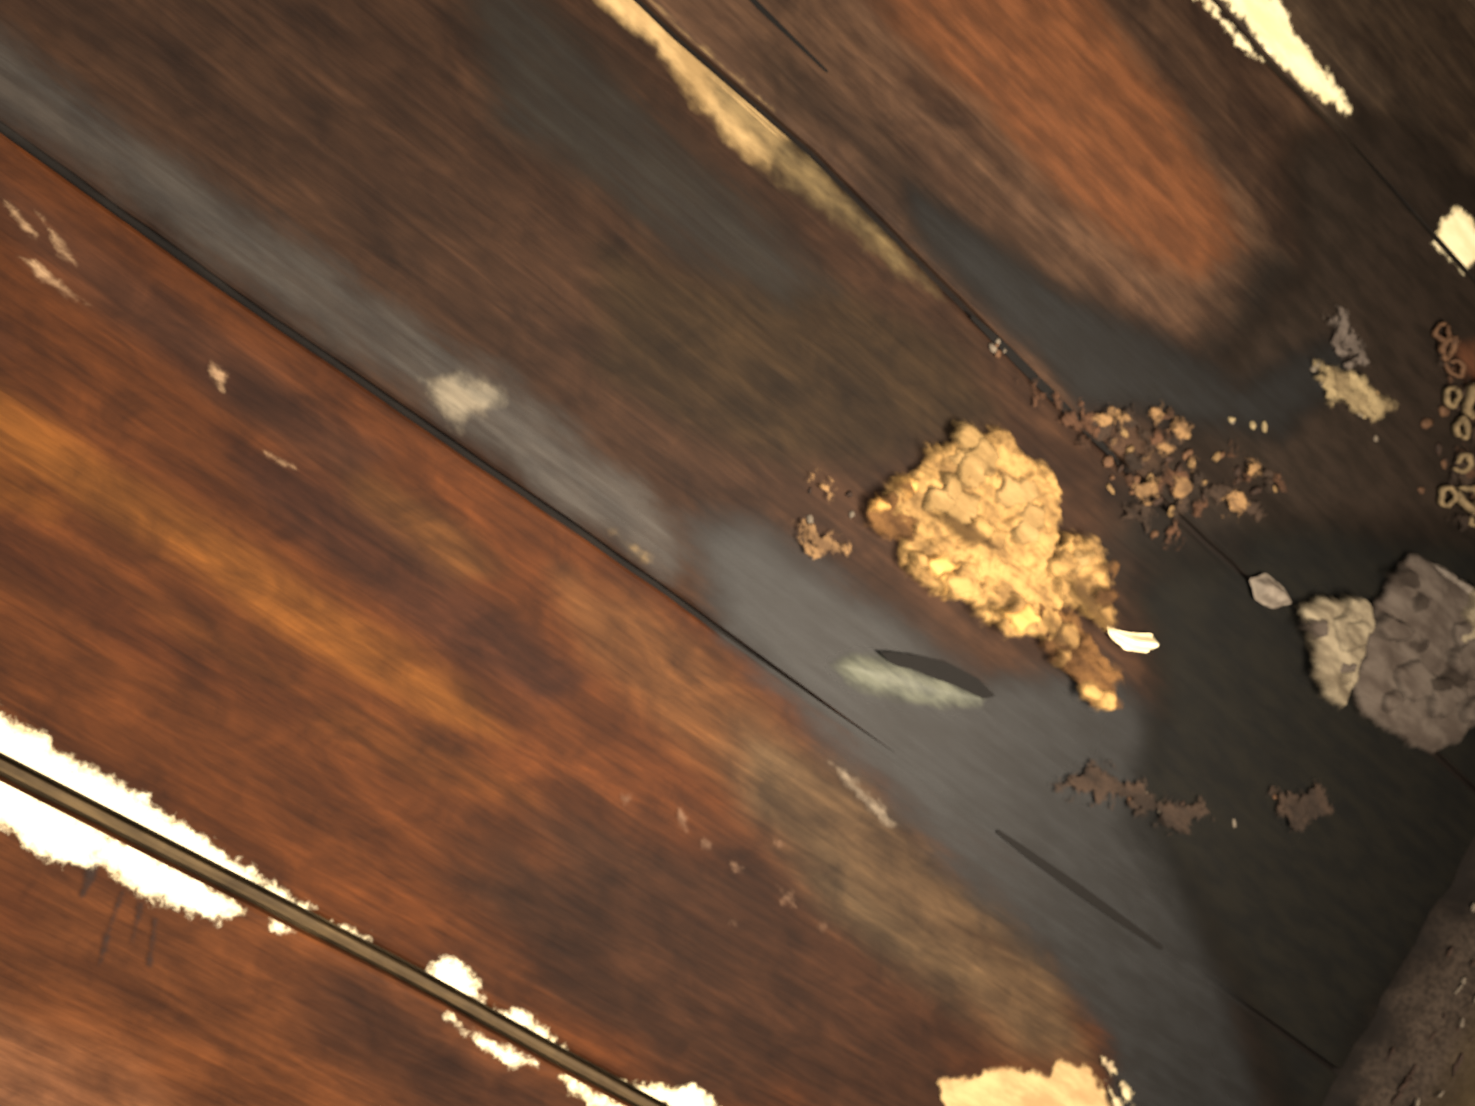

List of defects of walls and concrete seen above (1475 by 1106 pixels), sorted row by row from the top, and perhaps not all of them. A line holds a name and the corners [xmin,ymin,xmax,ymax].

crack [750,0,828,73]
peeling [1193,0,1351,114]
peeling [601,0,901,263]
peeling [1433,207,1475,275]
spalling [1033,382,1287,543]
peeling [1310,305,1398,442]
peeling [1418,322,1475,531]
peeling [0,713,307,919]
peeling [429,959,478,997]
peeling [504,1009,555,1042]
peeling [639,1083,714,1106]
peeling [939,1058,1131,1106]